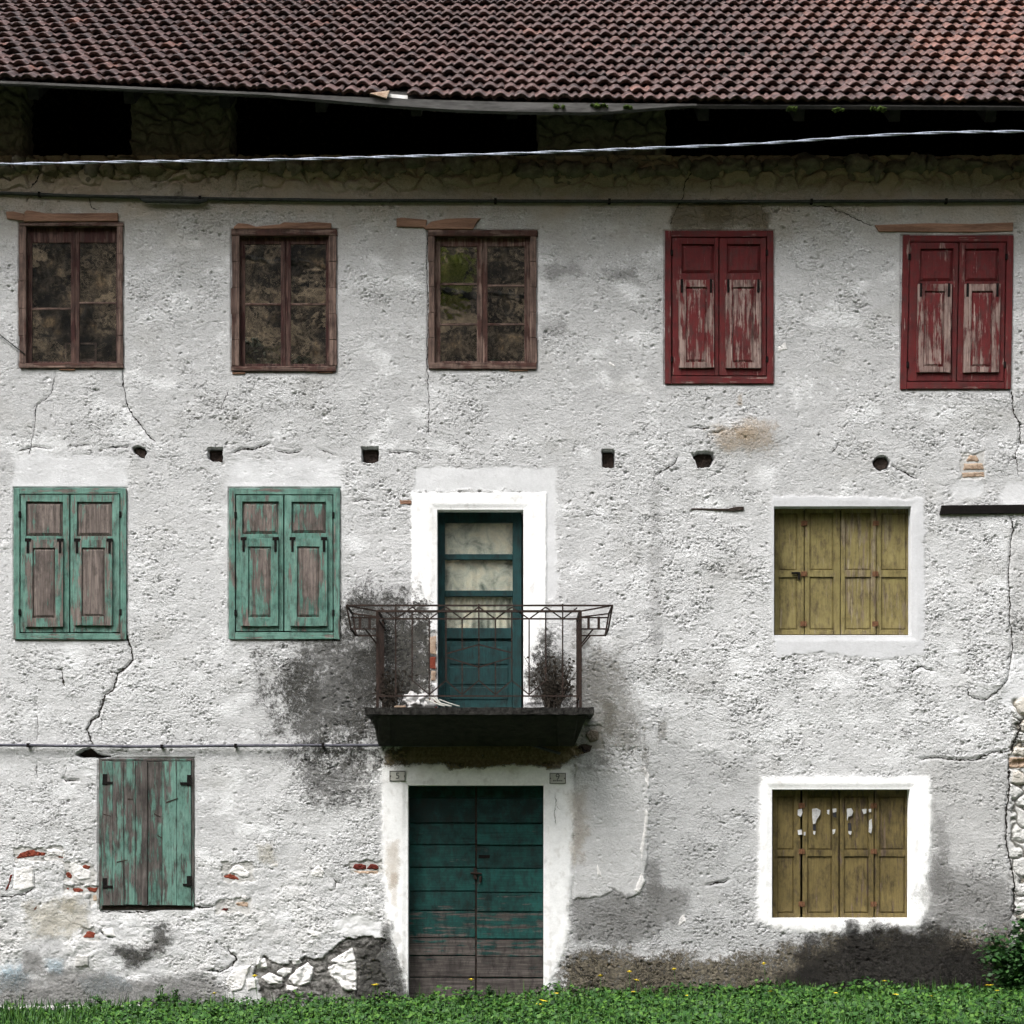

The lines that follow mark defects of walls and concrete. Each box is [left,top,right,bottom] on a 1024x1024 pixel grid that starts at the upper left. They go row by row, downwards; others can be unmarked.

crack [19,371,155,453]
crack [962,518,1015,701]
crack [86,635,134,744]
leakage [251,574,583,812]
spalling [1008,755,1024,771]
spalling [5,846,99,907]
peeling [640,810,650,861]
leakage [0,923,228,1008]
peeling [226,936,387,1007]
leakage [556,885,1014,1000]